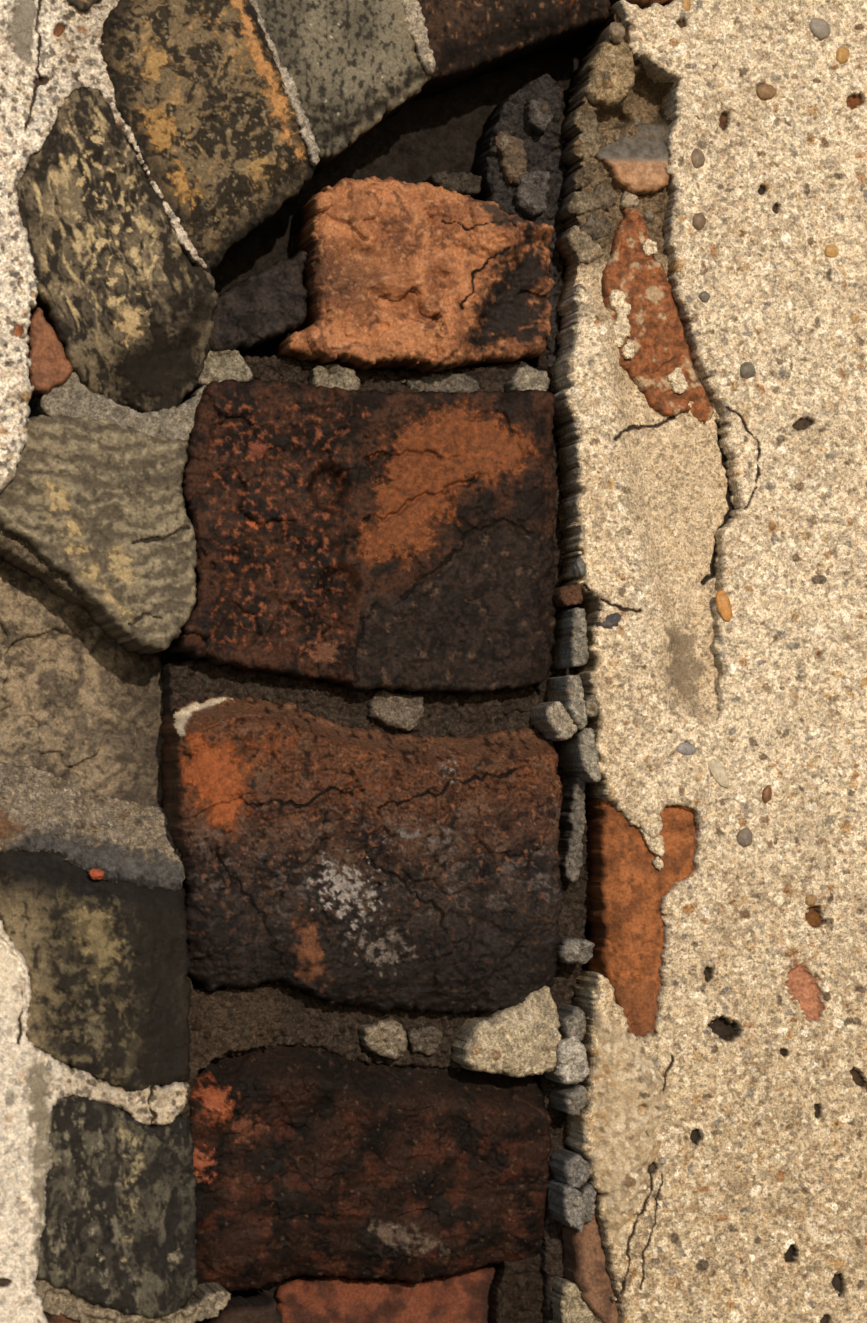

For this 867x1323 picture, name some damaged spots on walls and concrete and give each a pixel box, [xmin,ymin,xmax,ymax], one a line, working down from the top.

crack [25,0,42,131]
crack [161,84,642,1007]
spalling [554,9,735,731]
crack [614,416,675,441]
crack [701,406,761,585]
crack [192,847,570,1323]
spalling [584,798,697,1037]
crack [662,1055,674,1091]
spalling [785,954,824,1021]
crack [620,1173,663,1295]